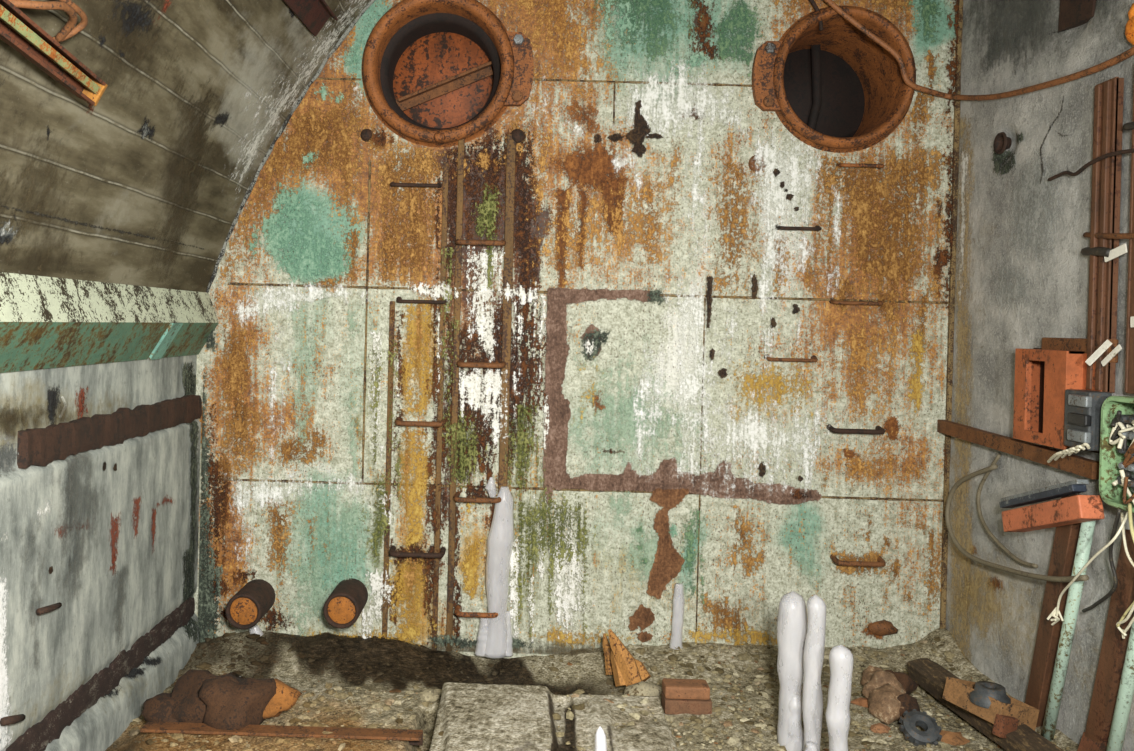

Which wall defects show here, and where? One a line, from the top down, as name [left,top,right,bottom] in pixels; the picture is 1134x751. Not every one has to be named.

peeling [589,0,765,77]
peeling [237,182,354,444]
damp [248,282,367,311]
peeling [344,330,401,476]
damp [408,183,599,655]
corrosion [205,0,959,649]
damp [0,572,13,751]